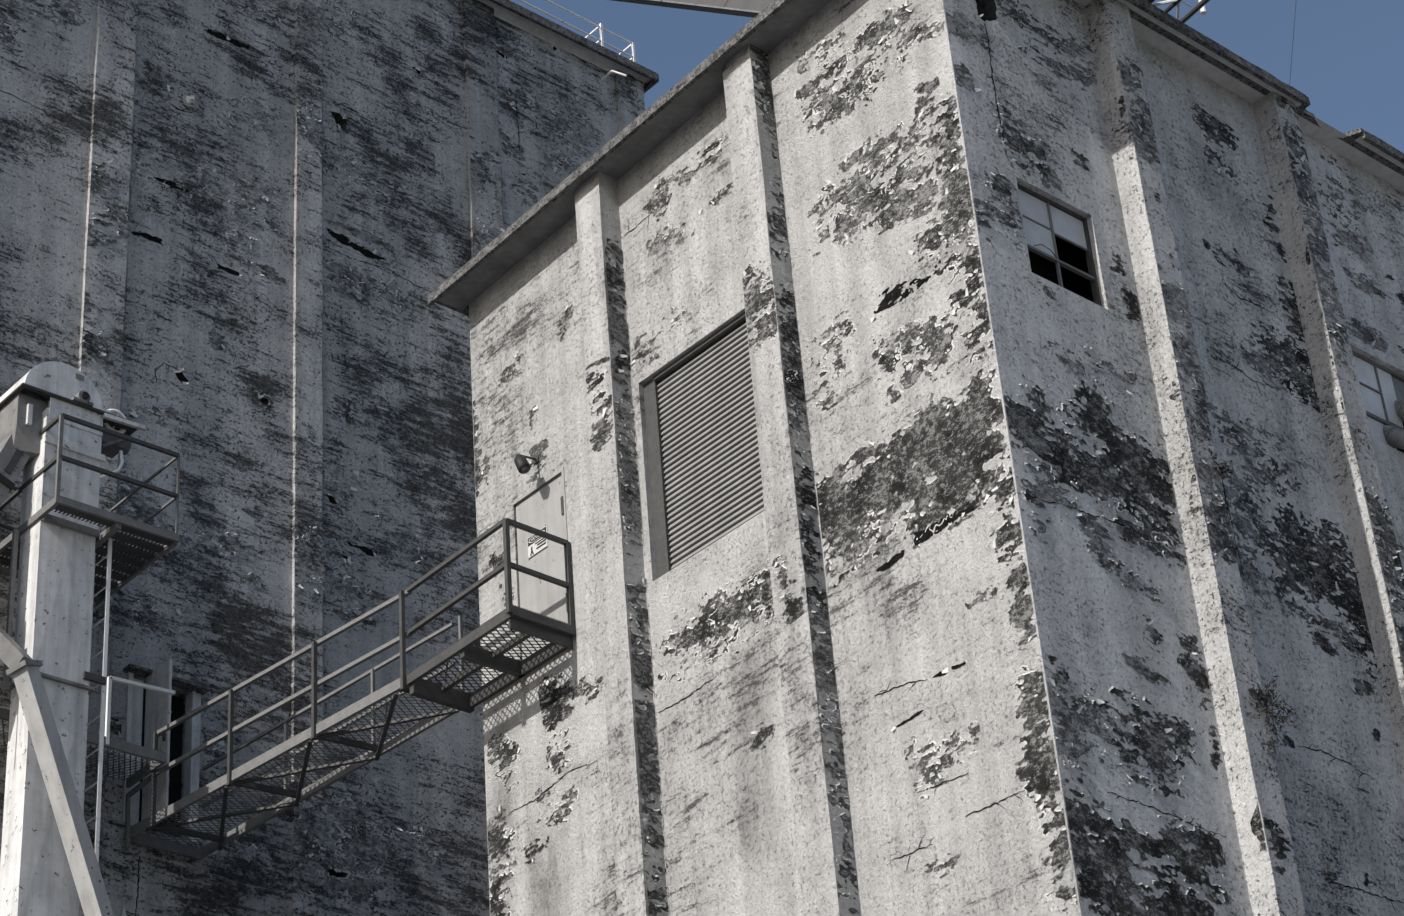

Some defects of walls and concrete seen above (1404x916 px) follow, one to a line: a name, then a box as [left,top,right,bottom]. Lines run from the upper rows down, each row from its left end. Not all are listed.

peeling [0,0,86,42]
spalling [204,29,250,50]
peeling [793,0,1161,165]
peeling [87,145,286,285]
peeling [323,218,409,317]
peeling [1240,94,1404,425]
spalling [174,368,189,385]
spalling [586,44,1378,916]
peeling [1335,444,1404,661]
peeling [293,792,439,916]
spalling [487,672,604,916]